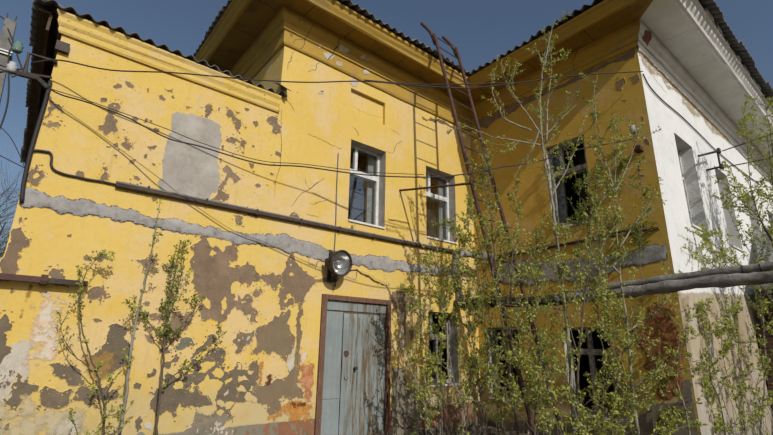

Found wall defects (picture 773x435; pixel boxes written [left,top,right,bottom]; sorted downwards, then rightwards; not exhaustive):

peeling [27,164,48,187]
peeling [42,95,65,131]
peeling [97,163,142,193]
peeling [97,97,157,166]
peeling [186,103,282,227]
spalling [478,30,731,144]
peeling [0,217,32,294]
peeling [0,264,135,435]
peeling [131,235,342,435]
spalling [632,304,684,400]